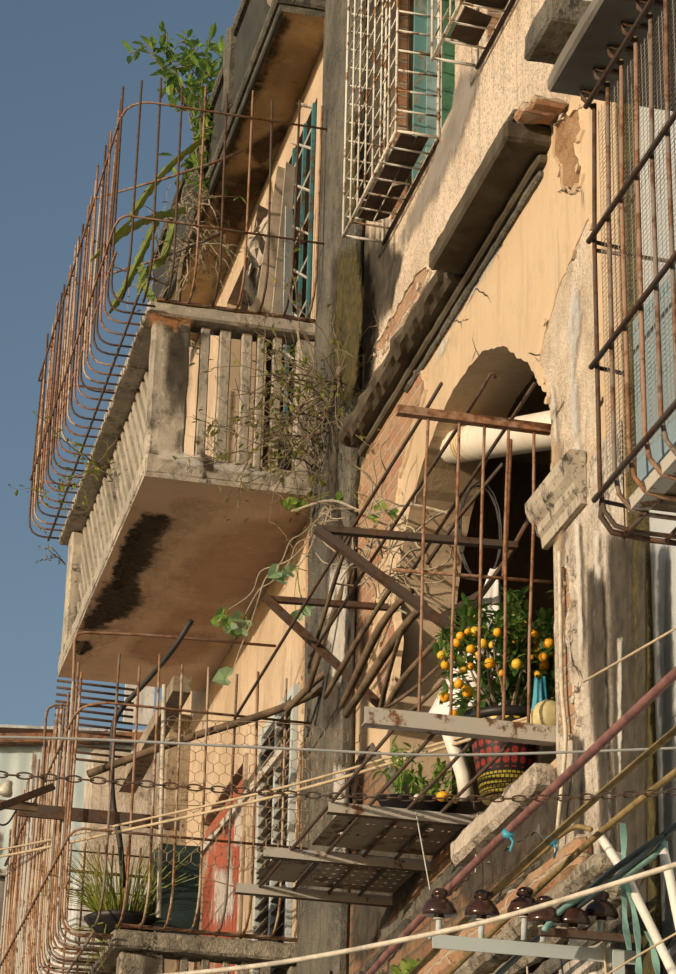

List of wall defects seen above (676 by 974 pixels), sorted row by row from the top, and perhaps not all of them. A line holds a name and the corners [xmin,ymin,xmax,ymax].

leakage [183,17,301,273]
flaking render [549,104,586,195]
spalling [373,264,432,356]
leakage [76,515,174,655]
flaking render [355,370,428,707]